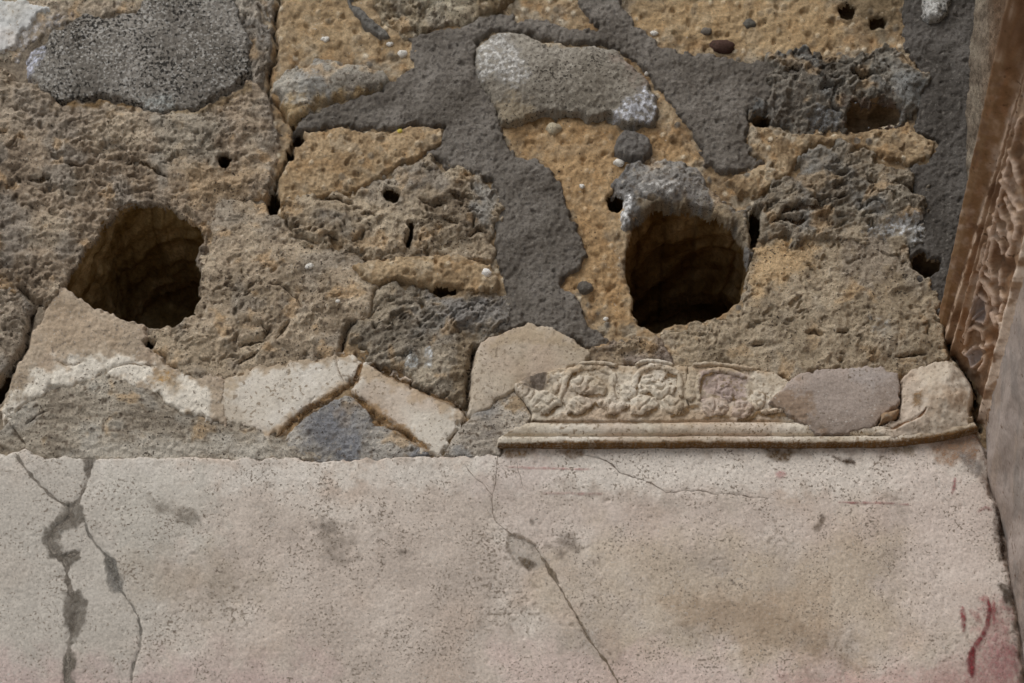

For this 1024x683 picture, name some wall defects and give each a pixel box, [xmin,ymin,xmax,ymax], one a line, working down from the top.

spalling [238,324,288,364]
spalling [0,374,532,463]
crack [467,456,523,533]
crack [13,411,142,683]
crack [536,548,619,683]